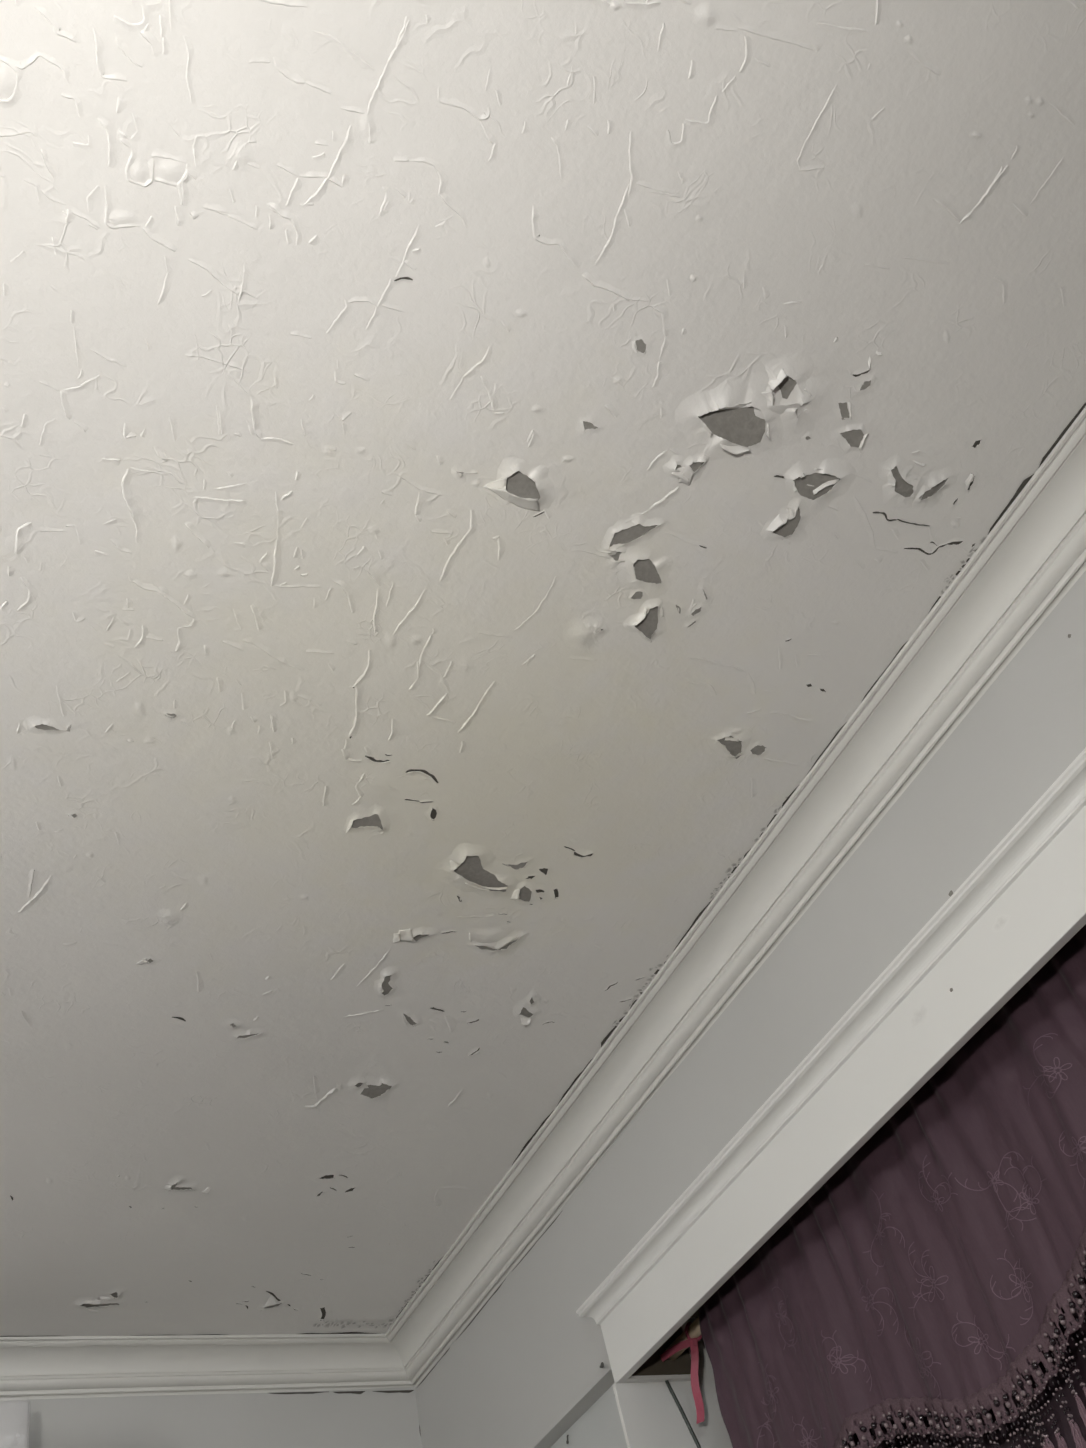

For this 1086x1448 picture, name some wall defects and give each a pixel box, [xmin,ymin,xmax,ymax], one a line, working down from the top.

peeling [436,455,555,519]
peeling [662,352,882,545]
peeling [878,433,989,509]
peeling [597,512,714,643]
peeling [707,726,771,761]
peeling [433,843,566,908]
peeling [343,925,530,1028]
peeling [344,1074,401,1104]
peeling [164,1175,212,1195]
peeling [70,1286,130,1313]